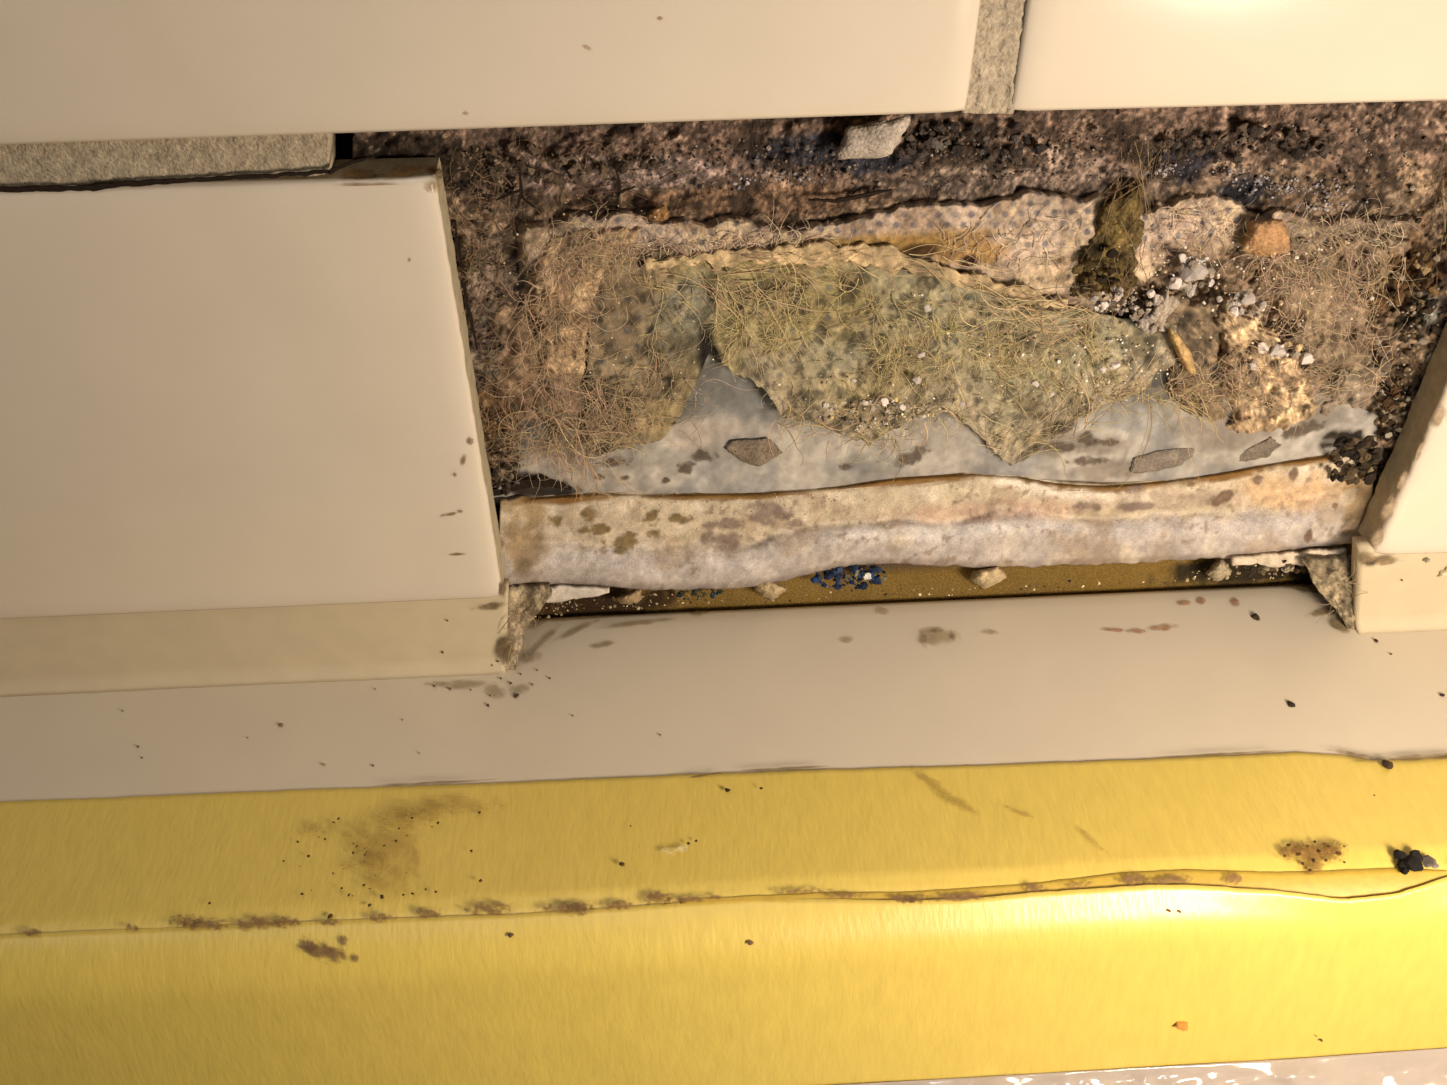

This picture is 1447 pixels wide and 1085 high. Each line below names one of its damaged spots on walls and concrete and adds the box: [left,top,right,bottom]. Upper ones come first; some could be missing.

water stain [1203,163,1368,215]
water stain [1069,161,1191,298]
flaking render [1152,289,1180,329]
water stain [663,450,711,483]
water stain [898,446,926,465]
water stain [1045,422,1119,466]
water stain [1283,421,1324,439]
spalling [1433,406,1444,426]
water stain [1121,485,1152,511]
water stain [1213,491,1233,506]
spalling [1372,443,1424,546]
water stain [580,504,796,555]